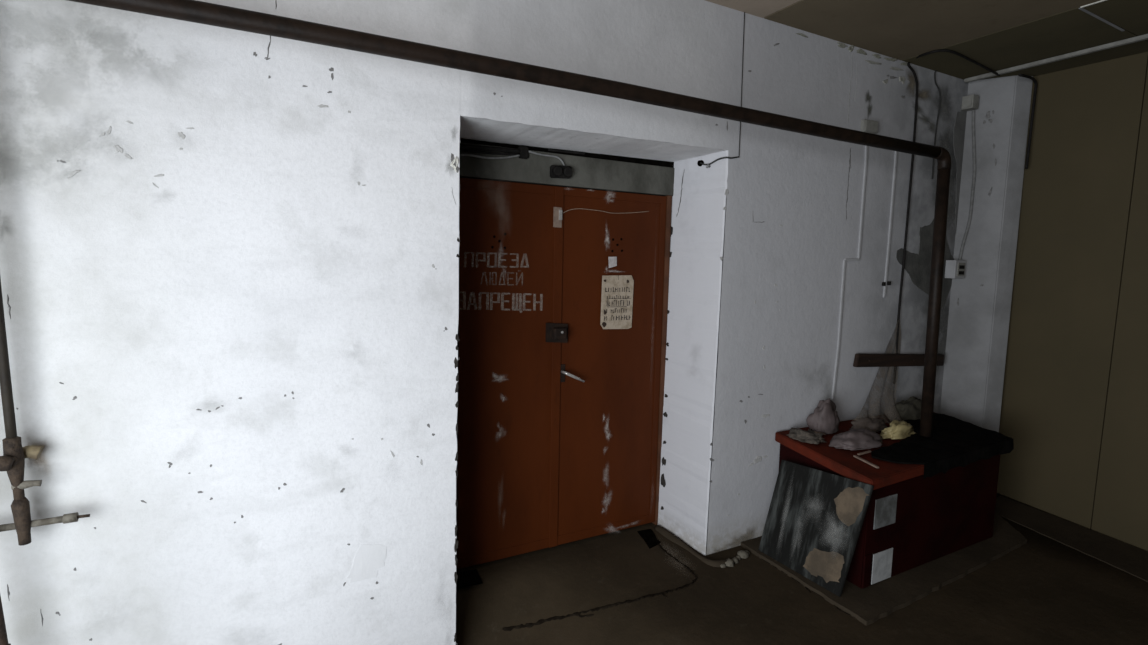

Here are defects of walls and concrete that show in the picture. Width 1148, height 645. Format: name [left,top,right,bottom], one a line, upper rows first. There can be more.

water stain [908,74,957,222]
water stain [937,305,949,371]